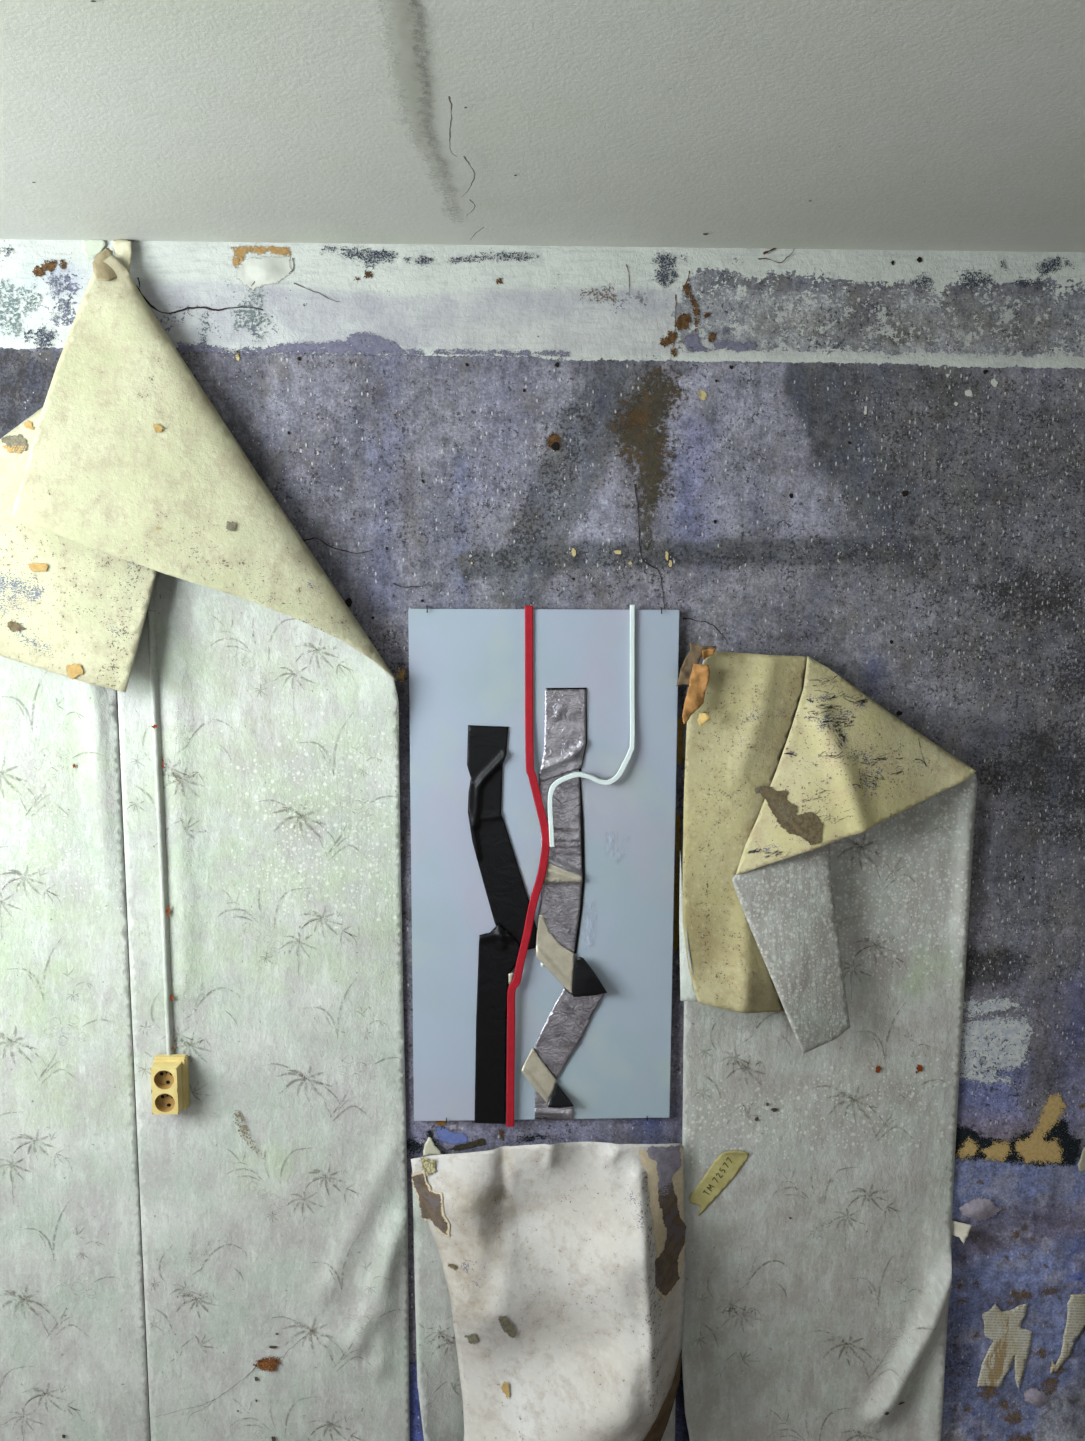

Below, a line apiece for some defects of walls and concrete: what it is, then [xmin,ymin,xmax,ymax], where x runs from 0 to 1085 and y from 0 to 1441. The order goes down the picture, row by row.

flaking render [231,245,291,268]
peeling [956,257,1078,292]
flaking render [24,259,72,352]
flaking render [651,251,770,357]
peeling [177,330,569,361]
peeling [673,813,681,952]
peeling [407,1121,564,1158]
peeling [955,1092,1085,1168]
flaking render [1005,1287,1062,1304]
flaking render [1032,1348,1066,1397]